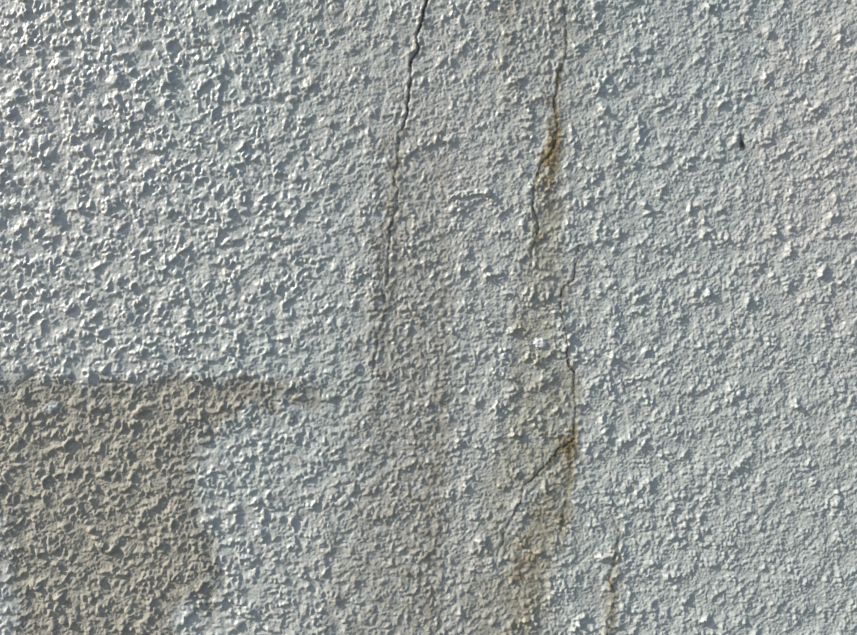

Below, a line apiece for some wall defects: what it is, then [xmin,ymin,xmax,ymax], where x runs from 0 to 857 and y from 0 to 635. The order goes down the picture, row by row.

crack [394,0,428,193]
crack [532,28,567,249]
crack [503,254,578,542]
crack [607,530,620,635]